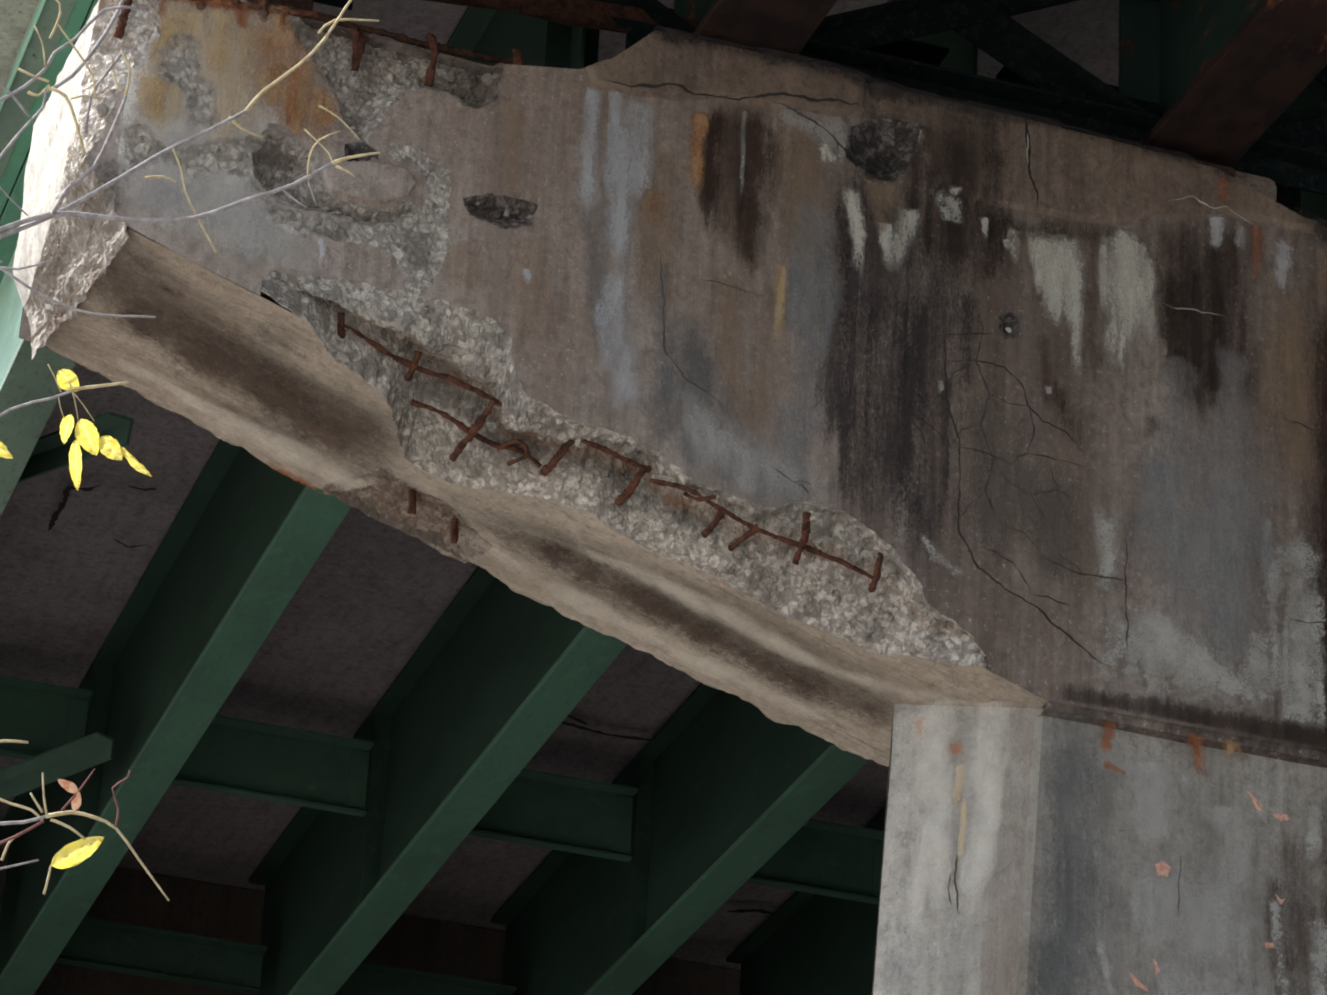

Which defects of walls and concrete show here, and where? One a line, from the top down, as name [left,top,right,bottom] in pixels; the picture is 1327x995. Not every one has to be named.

corrosion [184,0,337,137]
spalling [24,0,987,668]
efflorescence [581,89,651,257]
crack [603,79,864,168]
leakage [816,117,1083,574]
leakage [1096,216,1245,407]
leakage [1276,243,1291,288]
crack [885,289,1129,677]
leakage [1062,480,1327,747]
corrosion [1101,722,1125,774]
leakage [1266,807,1327,995]